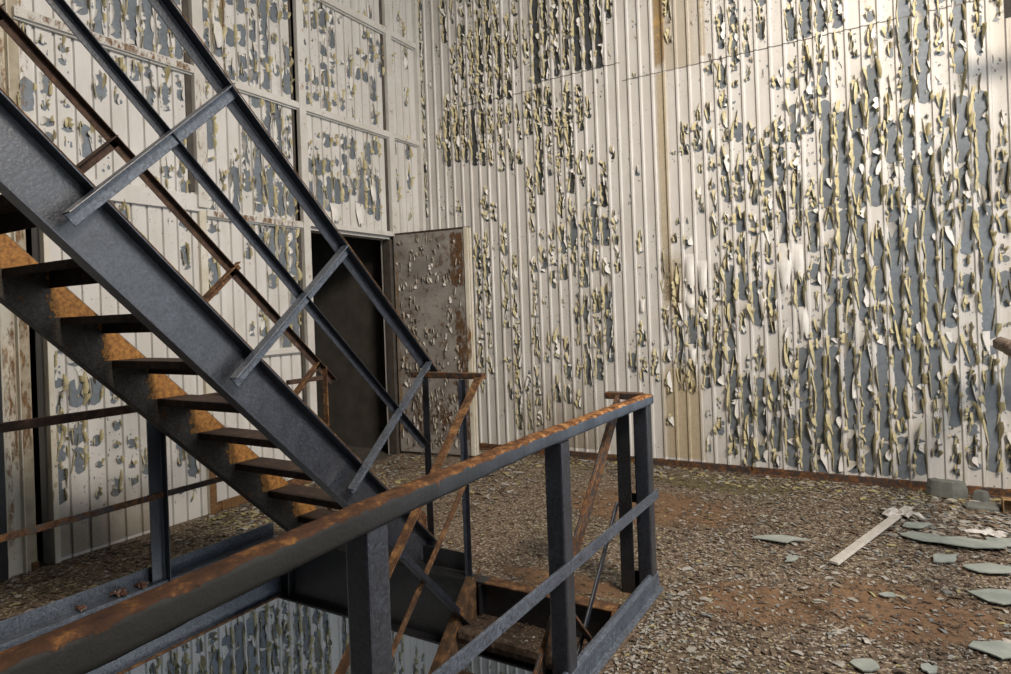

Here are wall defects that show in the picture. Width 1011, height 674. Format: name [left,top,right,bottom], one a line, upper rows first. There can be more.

peeling [72,0,186,112]
peeling [17,71,105,158]
corrosion [0,230,38,268]
peeling [202,0,621,450]
peeling [630,0,1011,479]
corrosion [45,271,188,400]
peeling [52,346,148,506]
corrosion [188,409,225,434]
corrosion [226,443,258,464]
corrosion [259,474,289,493]
corrosion [291,502,317,517]
peeling [149,600,349,674]